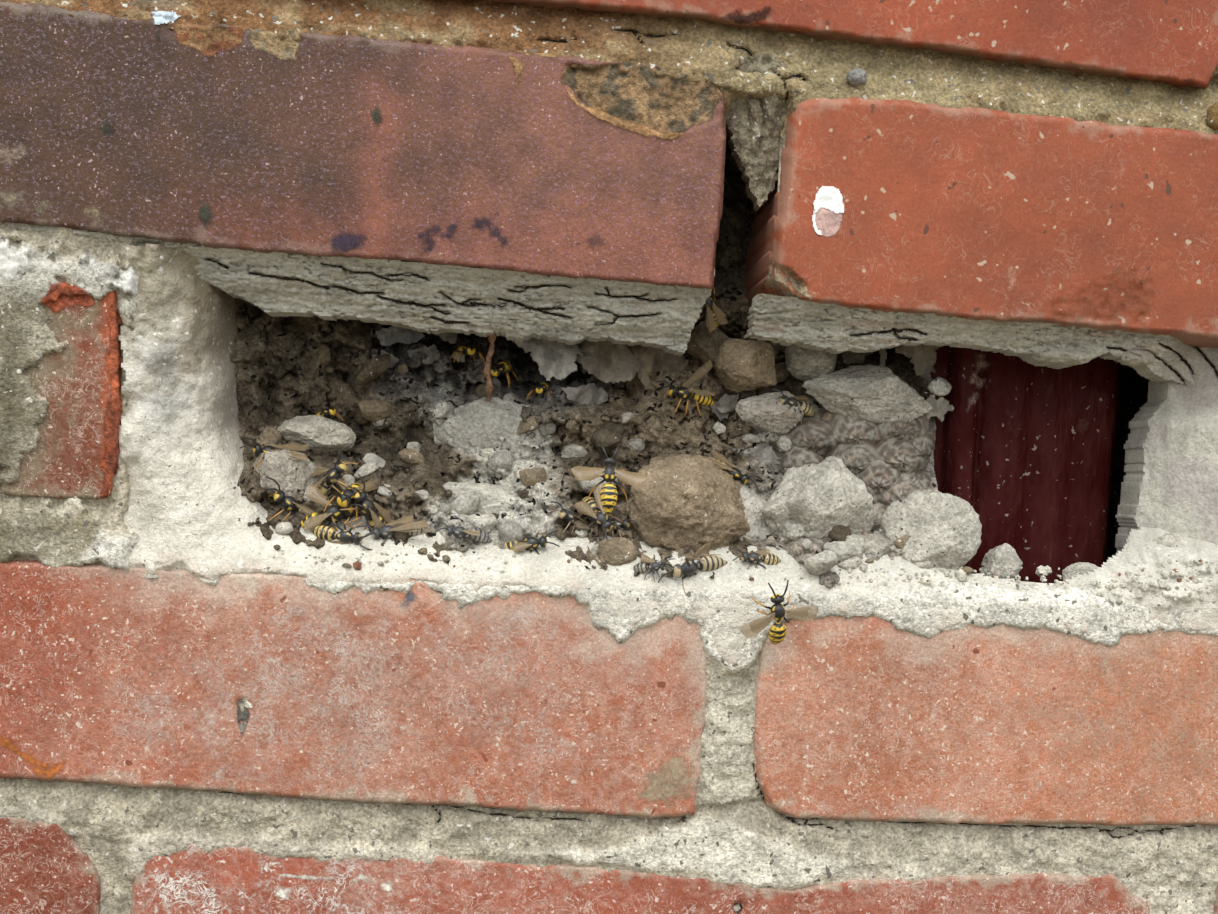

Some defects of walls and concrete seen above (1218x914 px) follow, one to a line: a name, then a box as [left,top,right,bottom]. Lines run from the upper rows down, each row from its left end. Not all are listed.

spalling [496,48,723,139]
peeling [0,237,29,279]
spalling [41,282,94,313]
crack [206,258,676,326]
spalling [756,261,811,300]
crack [850,328,927,341]
spalling [80,255,139,498]